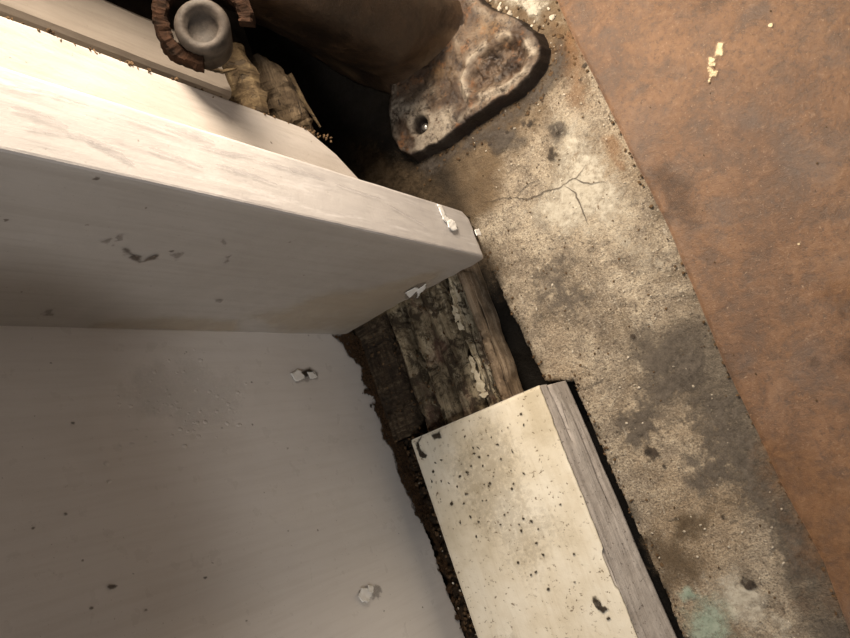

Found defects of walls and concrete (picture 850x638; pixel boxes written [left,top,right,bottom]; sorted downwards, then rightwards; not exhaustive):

peeling [437,204,458,231]
crack [487,169,603,222]
water stain [615,329,707,447]
water stain [682,393,827,578]
water stain [723,581,761,619]